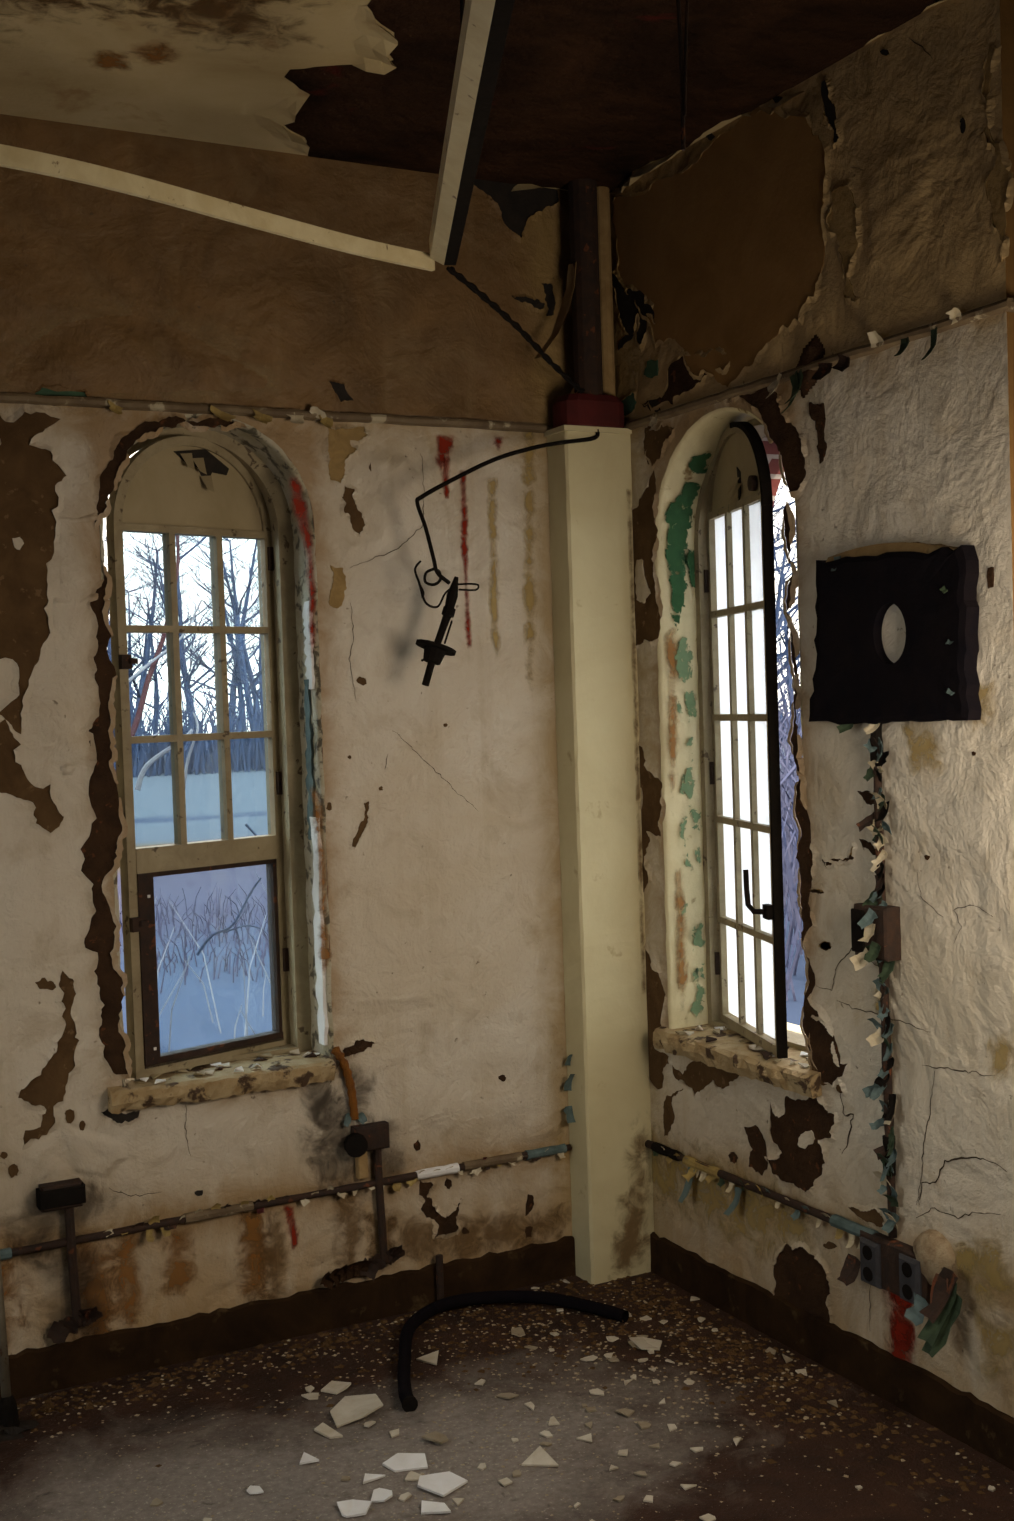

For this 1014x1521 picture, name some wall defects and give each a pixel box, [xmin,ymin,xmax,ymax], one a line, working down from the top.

damp [149,0,284,44]
flaking render [253,0,465,174]
peeling [921,307,962,360]
peeling [0,384,92,837]
flaking render [0,564,132,1178]
flaking render [100,1106,141,1127]
crack [819,948,1007,1219]
damp [77,1234,140,1335]
damp [164,1233,194,1292]
damp [241,1212,285,1300]
damp [338,1197,562,1265]
peeling [904,1267,963,1358]